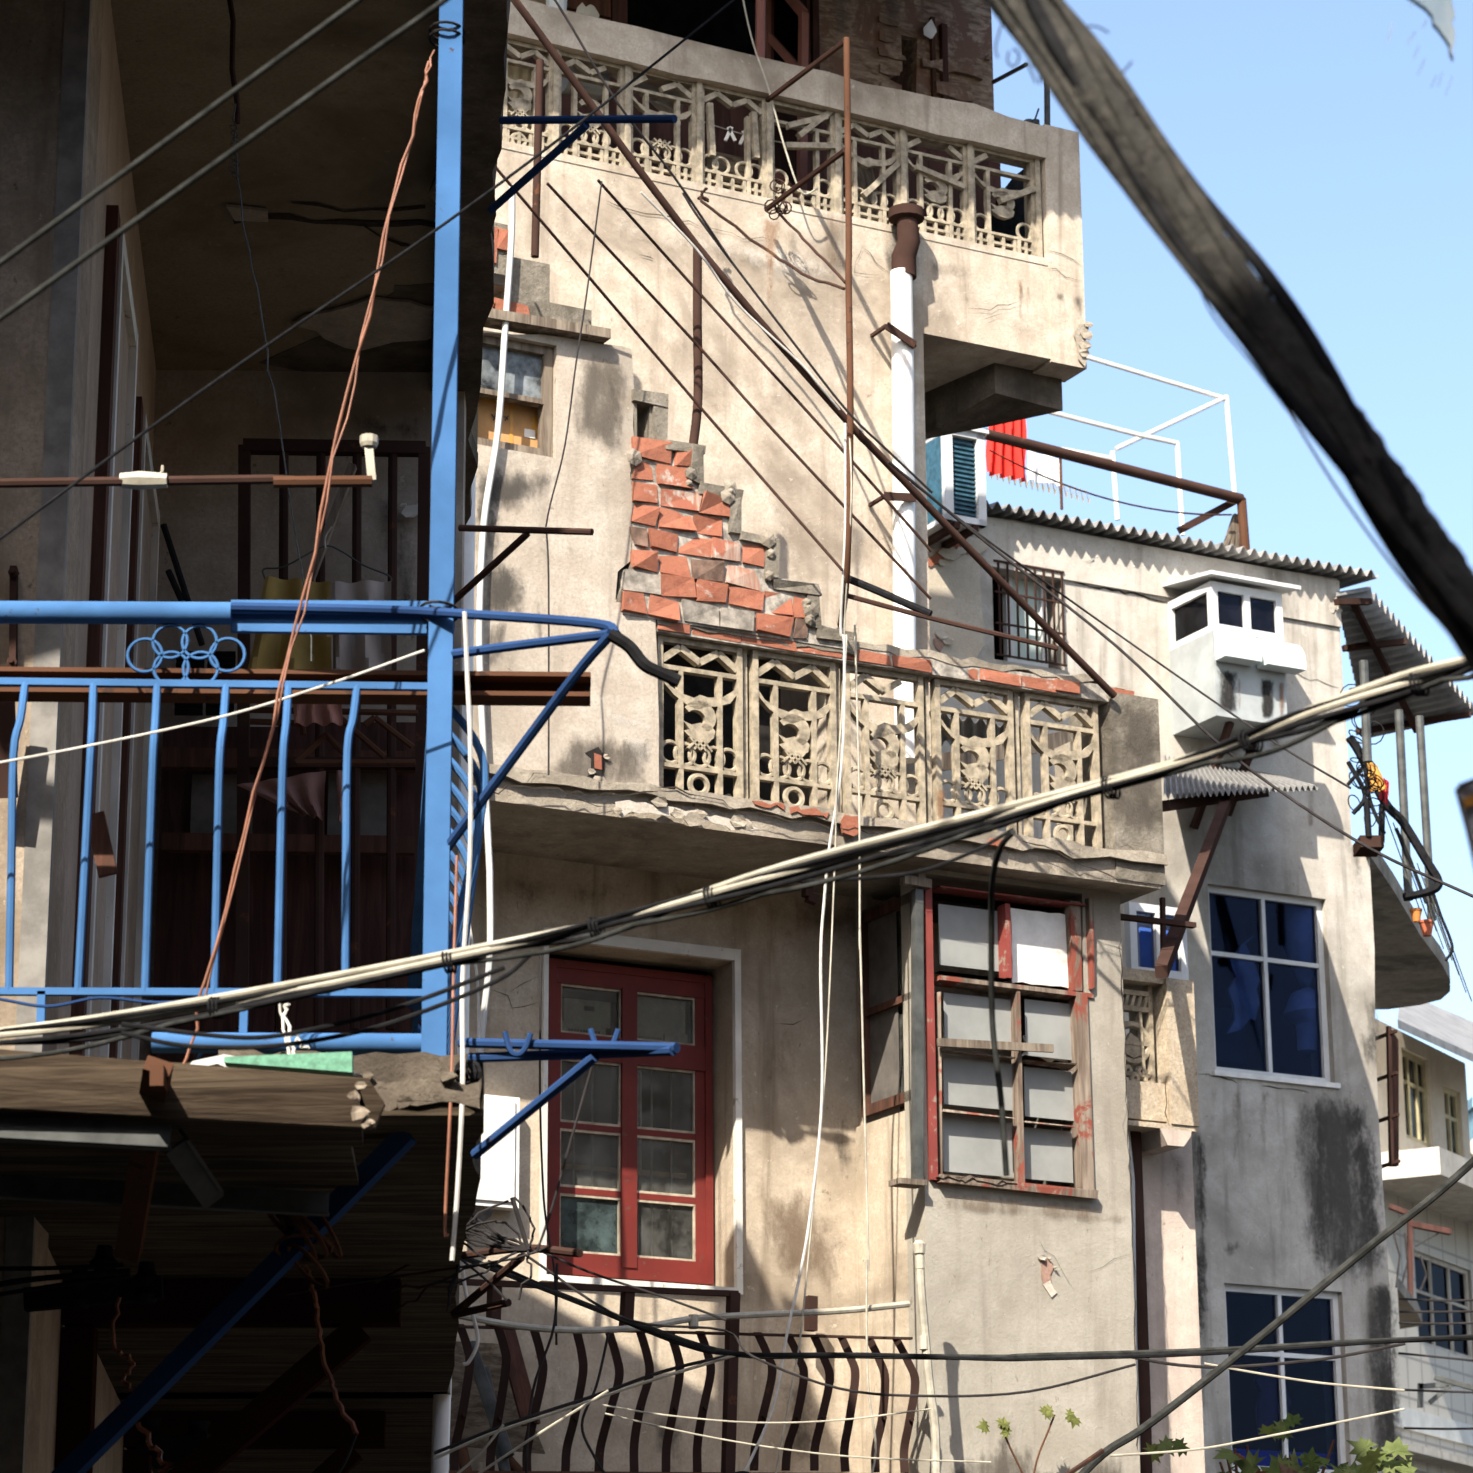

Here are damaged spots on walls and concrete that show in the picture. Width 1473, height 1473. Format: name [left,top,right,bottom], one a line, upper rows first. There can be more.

peeling [291,296,434,351]
damp [582,361,618,443]
spalling [618,436,955,673]
spalling [968,668,1080,694]
spalling [586,747,610,783]
spalling [613,797,858,837]
damp [1300,1100,1379,1271]
damp [1369,1288,1400,1460]